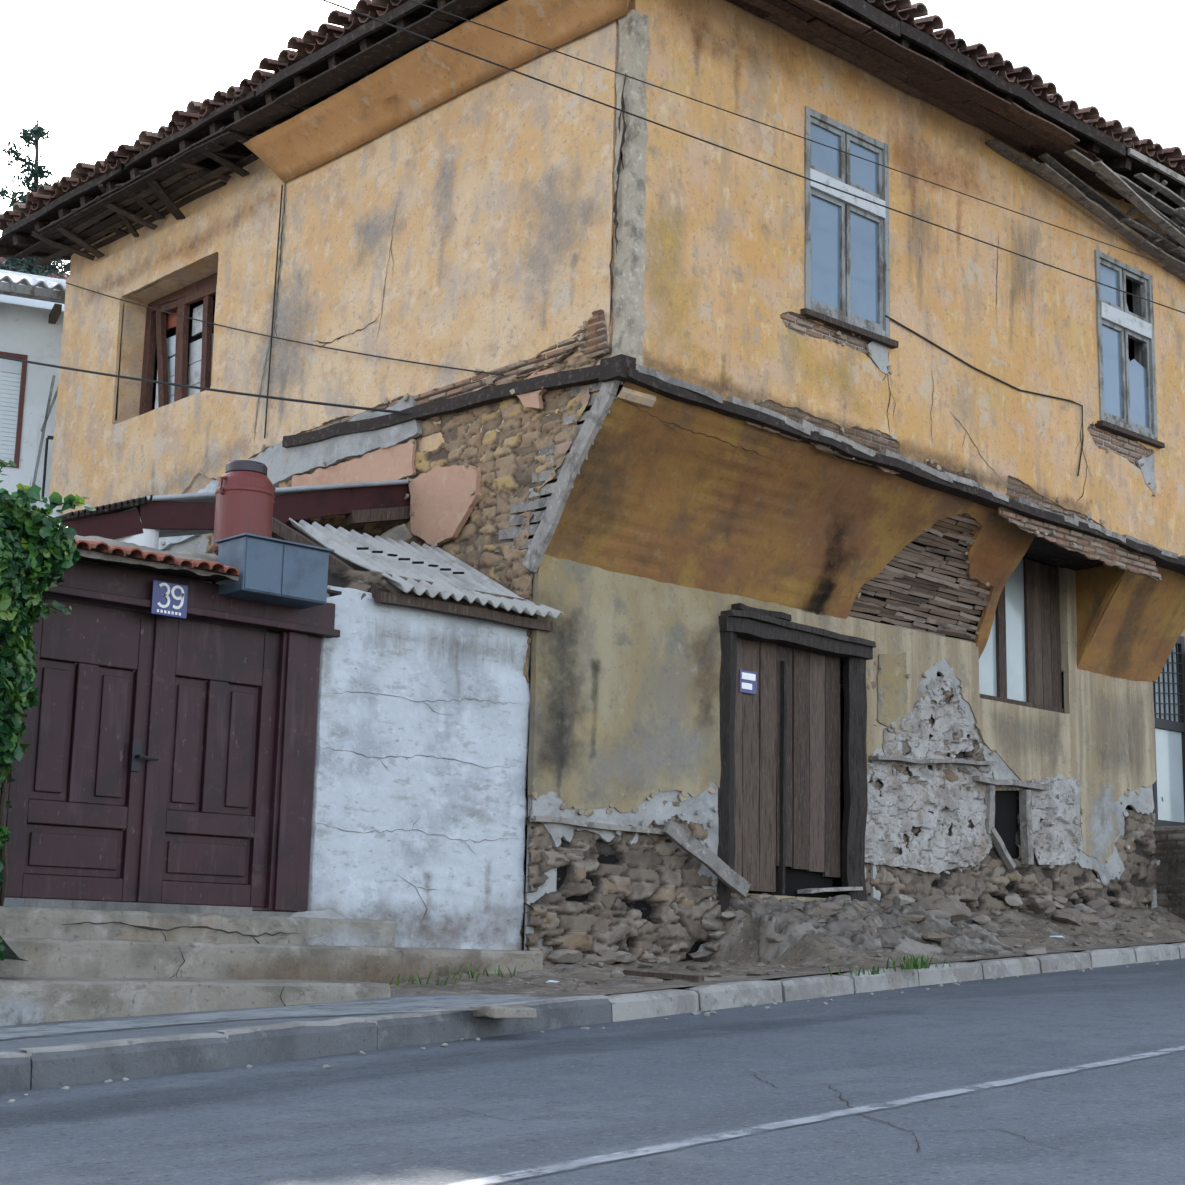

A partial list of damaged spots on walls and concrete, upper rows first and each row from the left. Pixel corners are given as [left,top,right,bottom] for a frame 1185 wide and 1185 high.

crack [608,73,627,330]
crack [313,206,397,349]
flaking render [780,312,893,376]
flaking render [246,309,612,548]
spalling [357,547,464,574]
flaking render [849,513,992,643]
crack [312,815,516,855]
crack [321,747,516,768]
crack [324,691,520,715]
leakage [541,621,576,775]
flaking render [530,781,719,855]
peeling [865,652,1164,901]